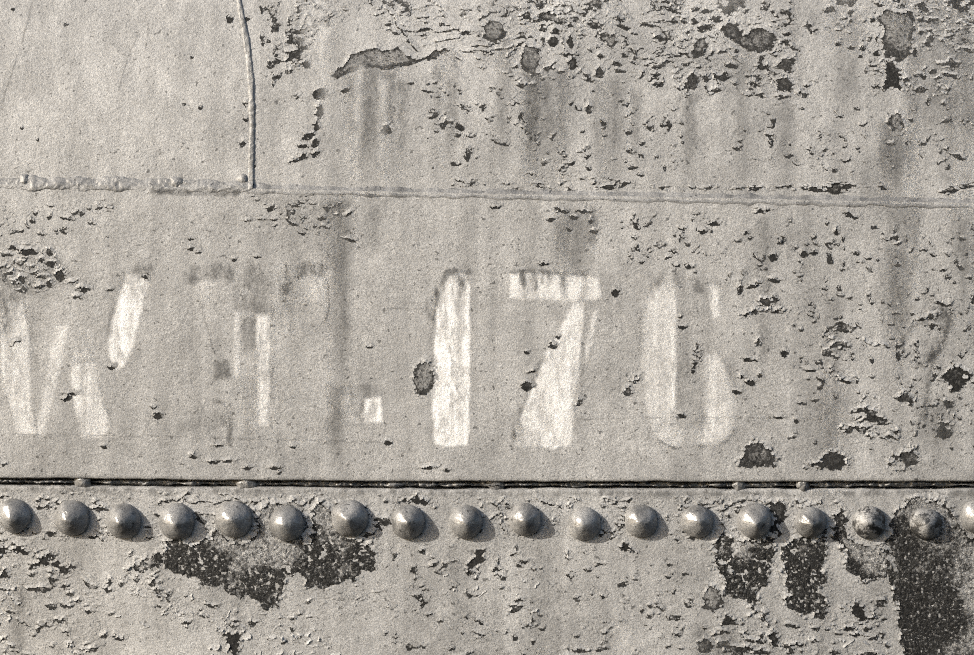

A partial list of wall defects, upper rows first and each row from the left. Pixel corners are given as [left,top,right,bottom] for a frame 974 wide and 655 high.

peeling [239,194,359,242]
peeling [542,203,601,234]
spalling [0,198,116,300]
peeling [184,235,204,254]
peeling [546,333,563,349]
peeling [614,203,974,473]
peeling [409,353,439,399]
peeling [517,348,539,392]
peeling [571,392,586,406]
peeling [416,461,452,472]
peeling [0,488,974,655]